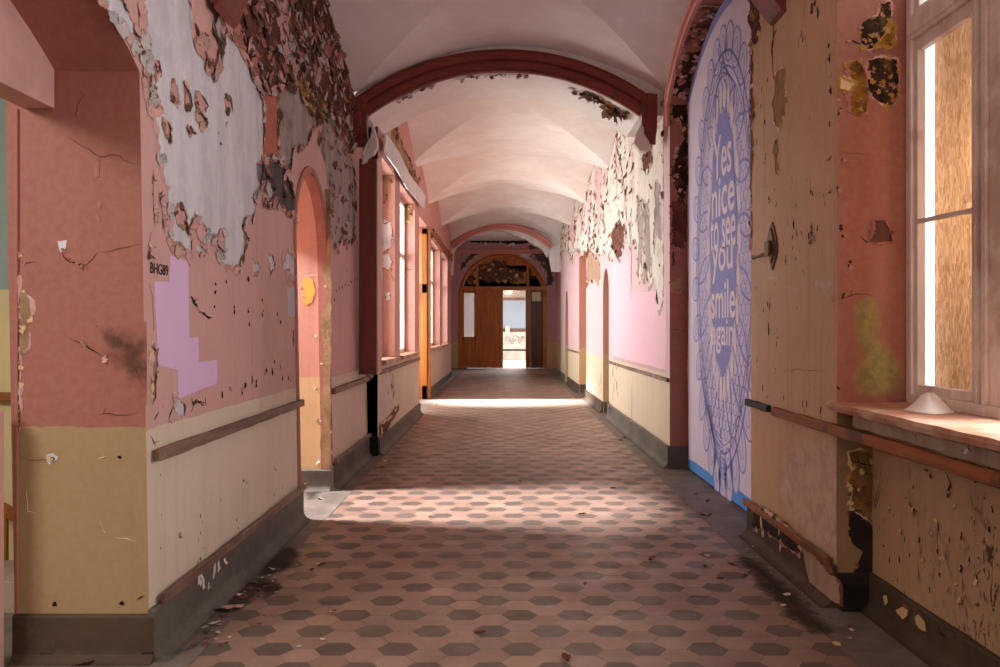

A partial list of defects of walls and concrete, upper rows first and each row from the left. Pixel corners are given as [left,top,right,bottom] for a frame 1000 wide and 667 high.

peeling [826,0,904,126]
crack [62,91,169,271]
peeling [97,0,358,309]
peeling [452,5,720,316]
flaking render [17,251,36,434]
mould [847,291,905,402]
peeling [752,426,884,573]